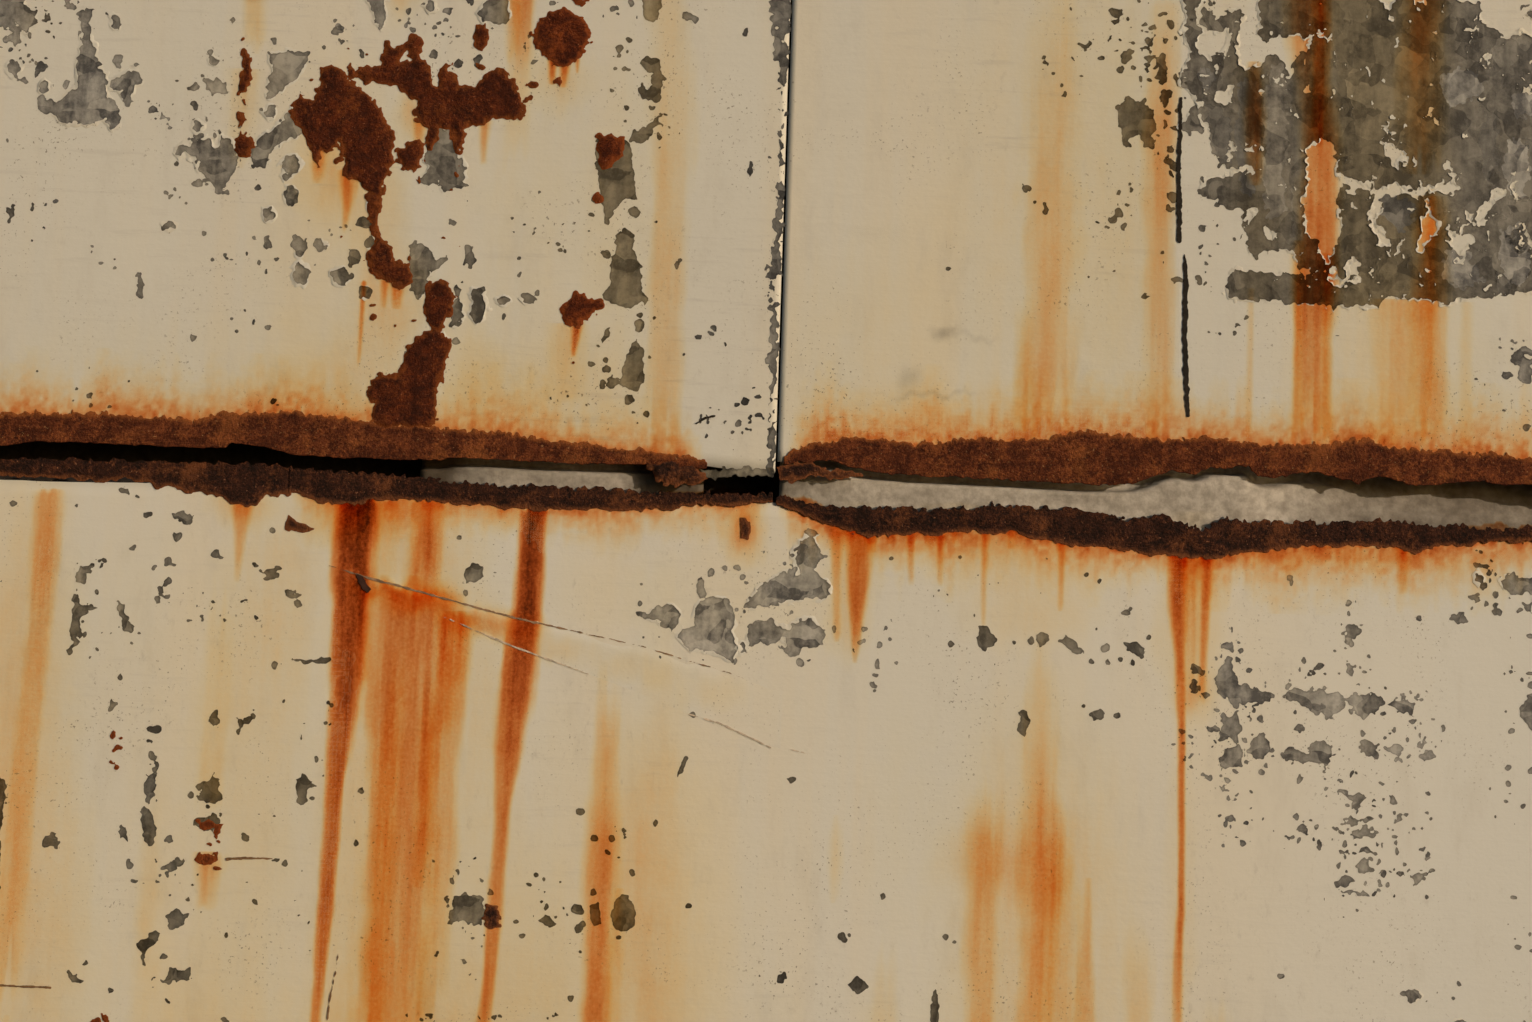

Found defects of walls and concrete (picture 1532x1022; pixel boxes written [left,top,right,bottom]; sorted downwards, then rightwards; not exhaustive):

rust [234,37,256,158]
peeling [0,0,513,301]
rust [288,33,539,290]
rust [473,23,489,51]
rust [529,0,593,87]
rust [595,133,625,170]
peeling [1042,0,1532,336]
peeling [409,240,539,345]
peeling [636,528,836,667]
rust [0,279,1532,929]
peeling [974,614,1151,666]
peeling [1171,600,1446,918]